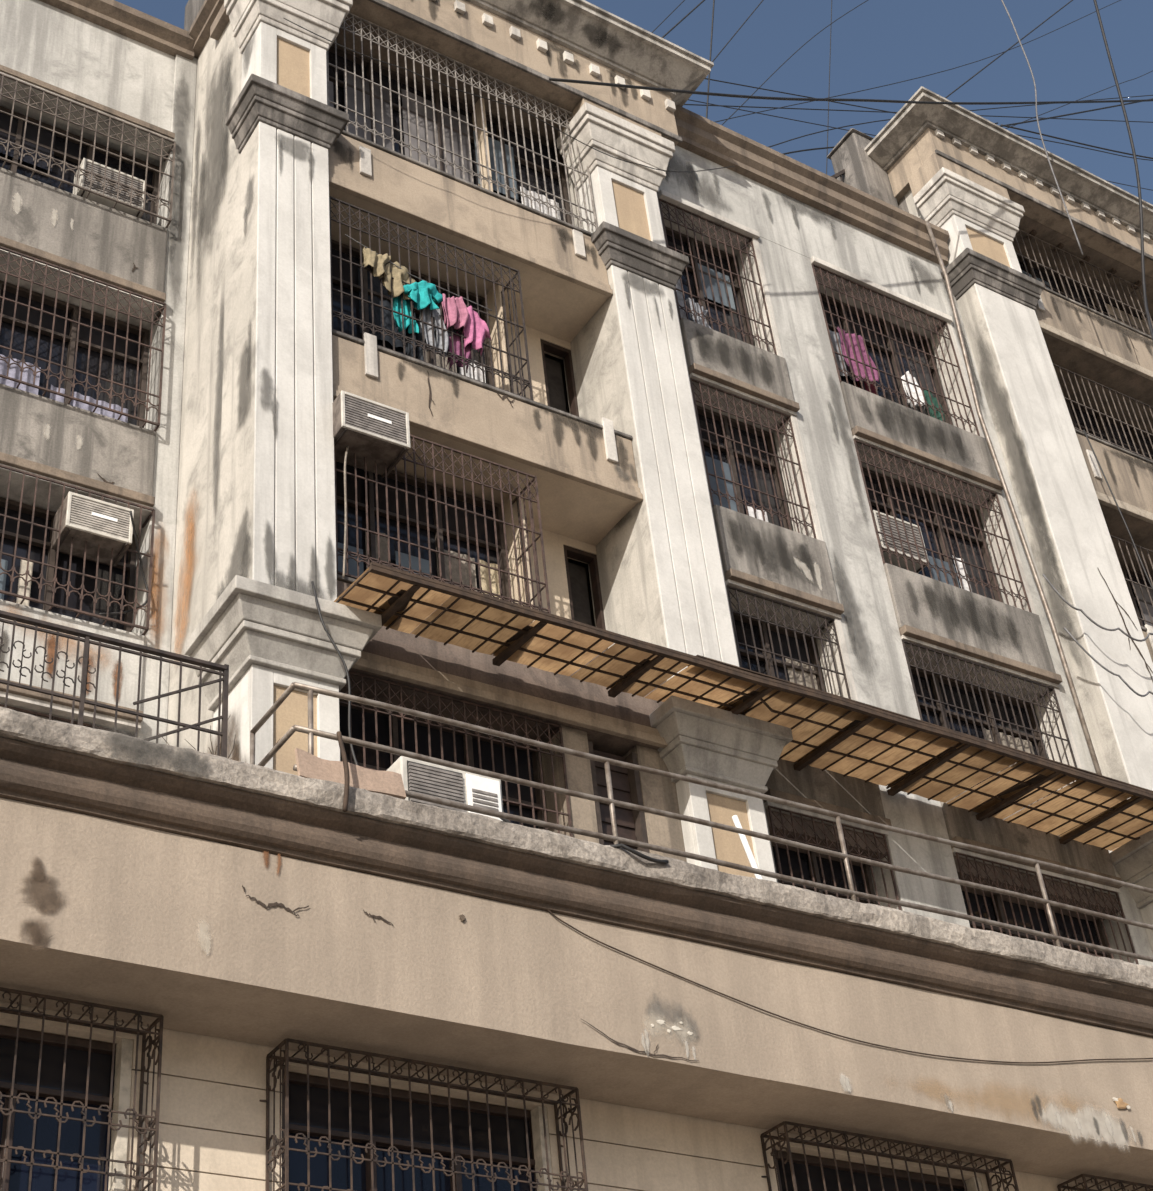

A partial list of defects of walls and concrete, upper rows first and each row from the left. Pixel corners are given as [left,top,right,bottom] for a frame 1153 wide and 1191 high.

leakage [170,62,230,300]
leakage [244,180,252,234]
corrosion [152,541,161,631]
corrosion [176,508,192,641]
corrosion [46,635,73,677]
corrosion [113,663,122,700]
leakage [23,858,62,949]
crack [242,885,309,916]
crack [363,910,393,925]
peeling [642,1004,697,1059]
peeling [1032,1096,1143,1146]